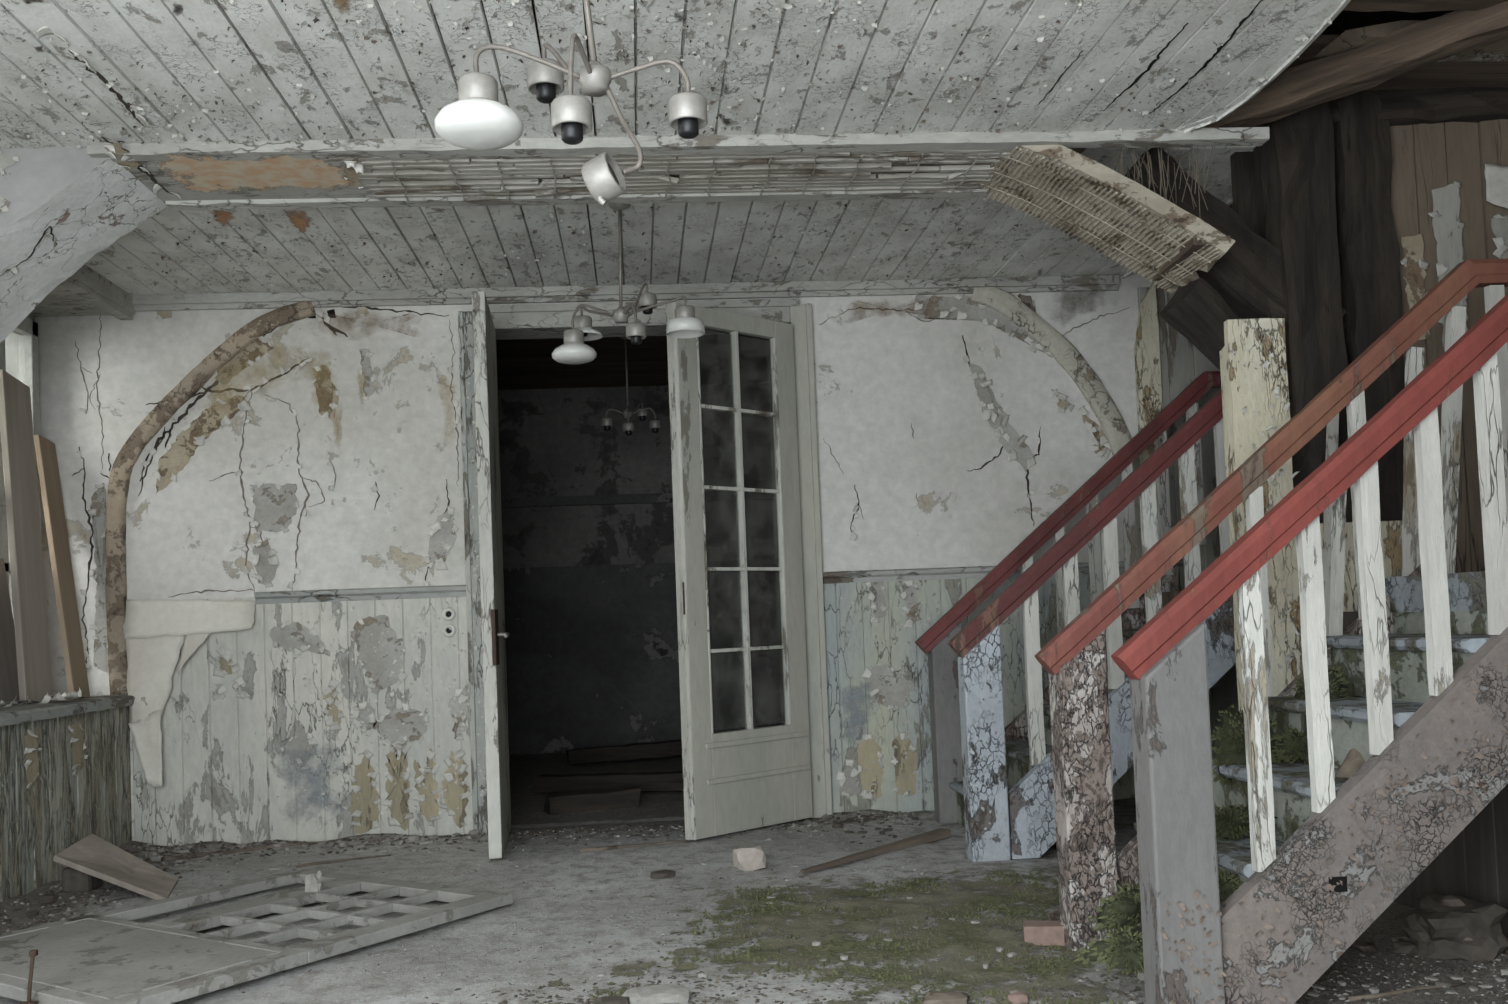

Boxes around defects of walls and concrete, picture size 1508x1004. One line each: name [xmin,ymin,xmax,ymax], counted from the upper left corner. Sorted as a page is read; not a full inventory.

peeling [0,0,1252,193]
crack [0,226,57,277]
peeling [127,203,674,294]
peeling [1400,181,1465,310]
peeling [1484,164,1508,259]
spalling [153,336,274,495]
peeling [311,365,339,421]
crack [967,402,1041,526]
peeling [250,483,299,588]
peeling [427,504,480,598]
peeling [865,581,922,629]
peeling [1060,658,1119,914]